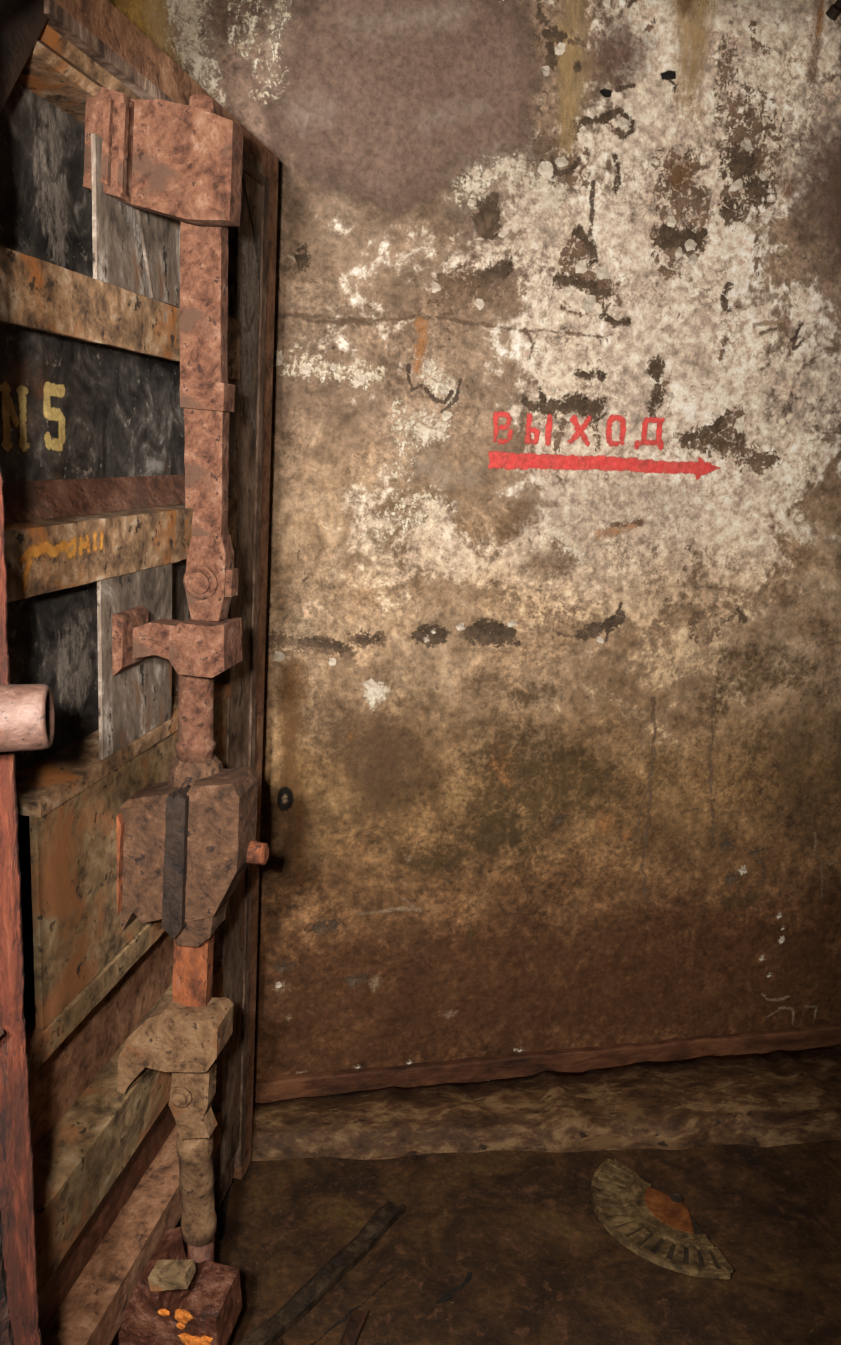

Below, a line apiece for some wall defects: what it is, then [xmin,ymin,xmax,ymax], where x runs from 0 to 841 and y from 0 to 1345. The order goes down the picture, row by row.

water stain [108,0,226,107]
water stain [561,0,583,153]
water stain [792,118,841,274]
water stain [361,399,450,556]
water stain [545,525,585,565]
water stain [700,647,814,715]
water stain [407,724,616,873]